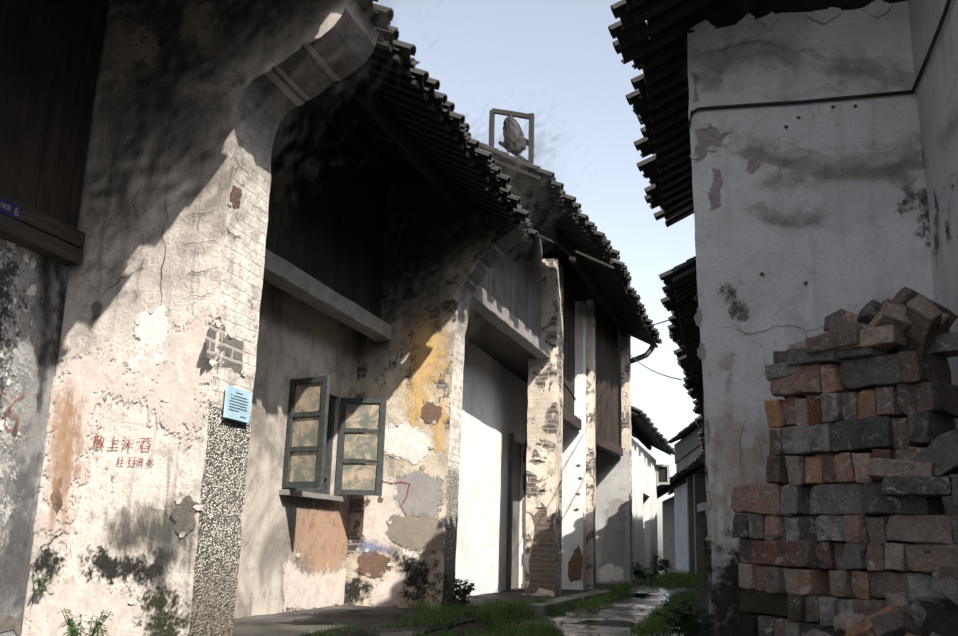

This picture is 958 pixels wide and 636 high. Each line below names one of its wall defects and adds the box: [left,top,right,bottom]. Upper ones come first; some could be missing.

flaking render [521,502,583,595]
flaking render [598,563,625,583]